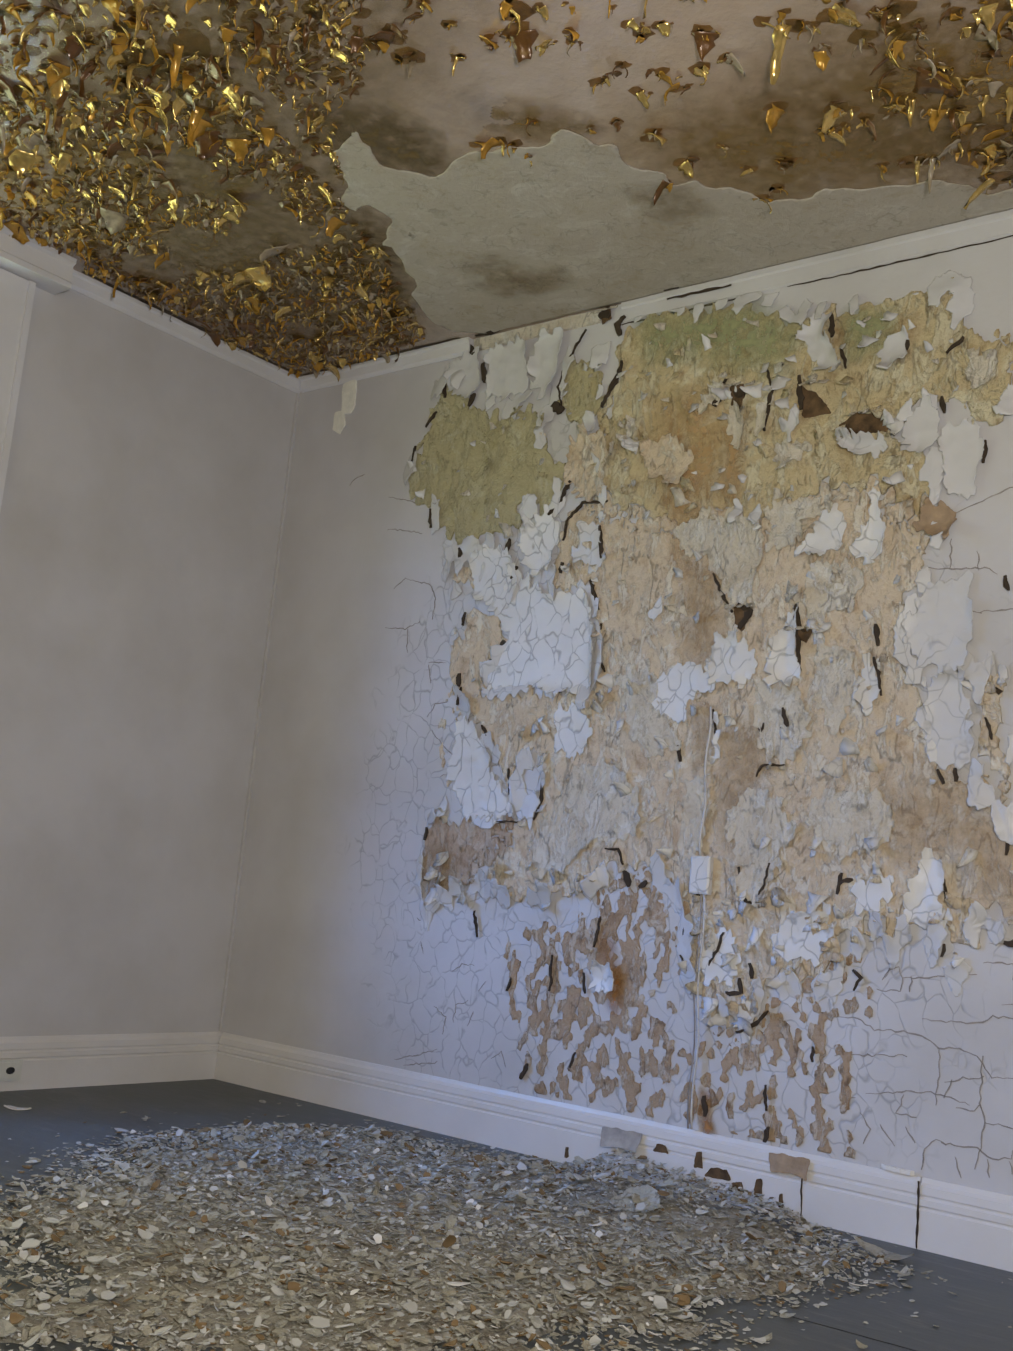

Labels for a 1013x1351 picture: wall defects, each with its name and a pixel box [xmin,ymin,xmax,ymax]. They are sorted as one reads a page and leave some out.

flaking render [0,0,1013,382]
leakage [490,107,579,137]
leakage [679,14,1013,197]
crack [928,487,1013,575]
crack [973,607,1013,615]
flaking render [403,270,1013,1158]
spalling [694,1152,763,1197]
crack [818,935,1013,1248]